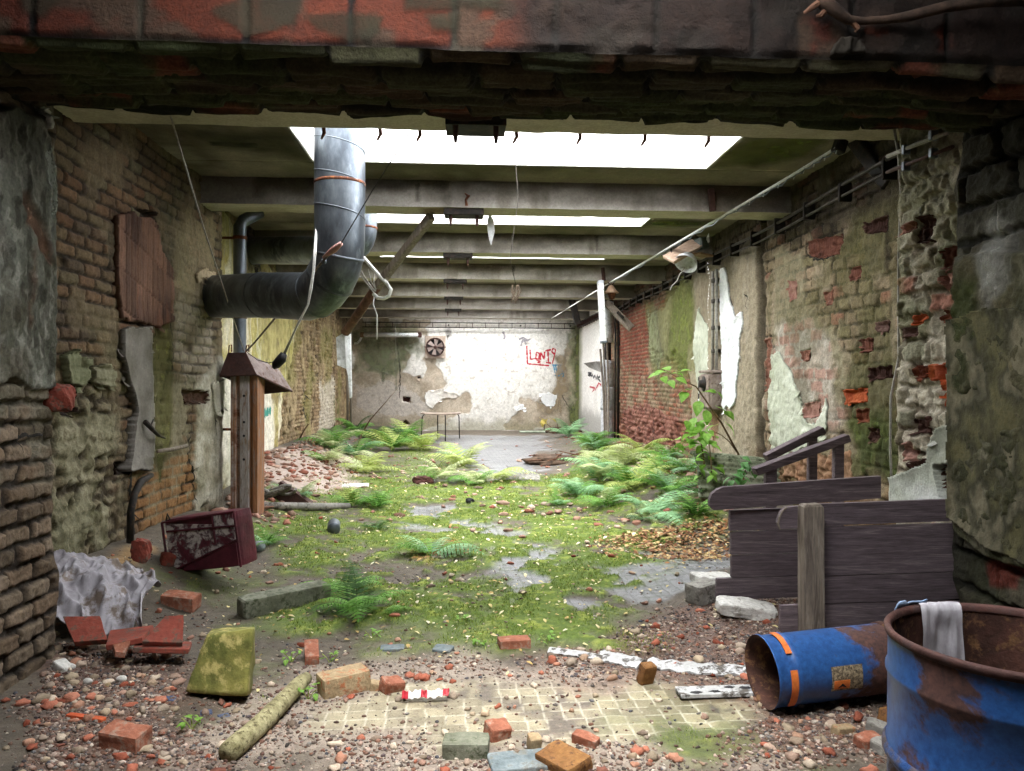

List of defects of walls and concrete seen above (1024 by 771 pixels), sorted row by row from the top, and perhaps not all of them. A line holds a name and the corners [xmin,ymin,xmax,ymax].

spalling [136,209,158,222]
spalling [808,234,844,259]
peeling [195,268,216,285]
peeling [719,267,744,415]
spalling [764,337,773,392]
spalling [800,350,811,362]
spalling [43,383,79,418]
peeling [181,379,228,416]
peeling [425,389,459,408]
peeling [539,392,557,409]
spalling [794,391,821,419]
spalling [843,365,894,444]